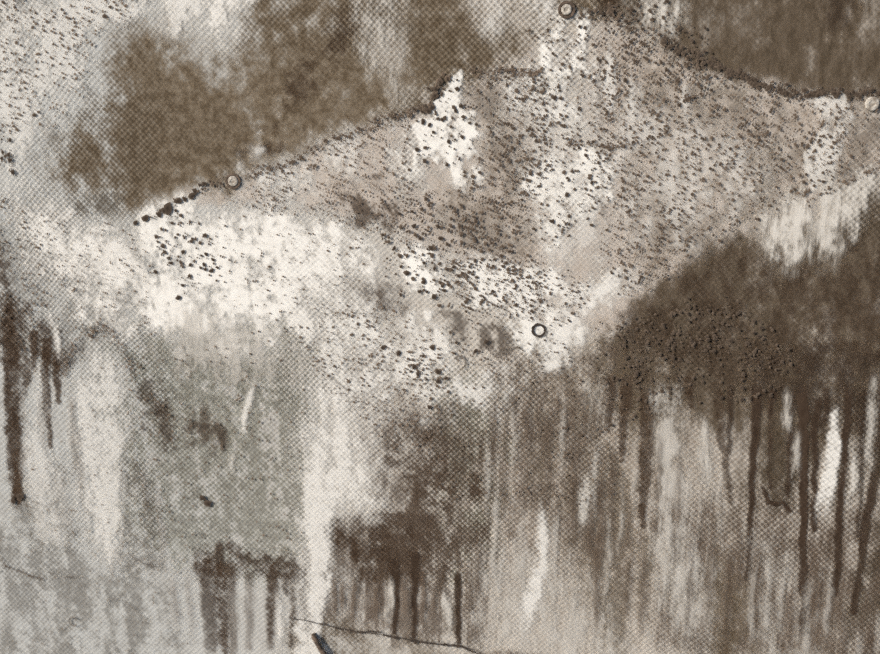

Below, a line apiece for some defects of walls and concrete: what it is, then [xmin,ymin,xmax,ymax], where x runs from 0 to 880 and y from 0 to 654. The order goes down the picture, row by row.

water stain [72,355,235,558]
crack [289,618,479,654]